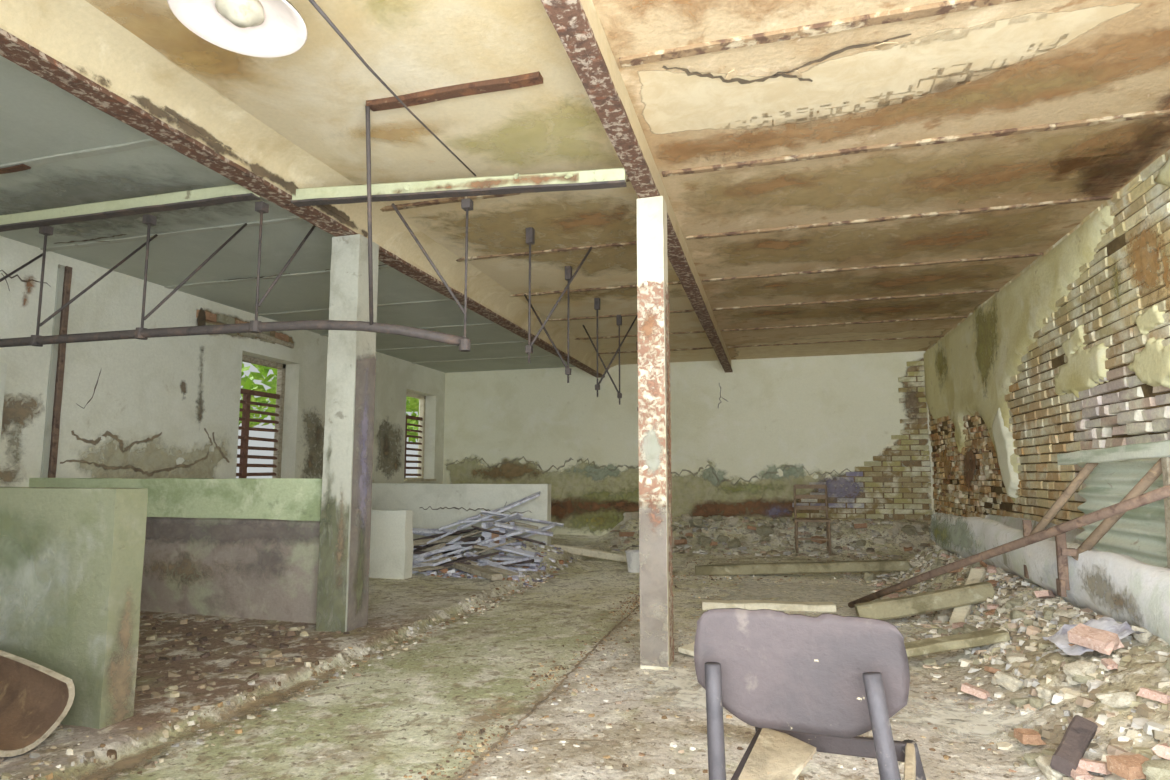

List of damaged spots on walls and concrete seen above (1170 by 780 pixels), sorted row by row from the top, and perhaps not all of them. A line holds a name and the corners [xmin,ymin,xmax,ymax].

leakage [662,30,1170,162]
leakage [690,97,1170,213]
leakage [722,207,1059,264]
crack [0,270,51,291]
leakage [720,264,1010,320]
peeling [446,205,1115,528]
peeling [1127,304,1170,388]
peeling [60,428,231,479]
corrosion [665,287,674,661]